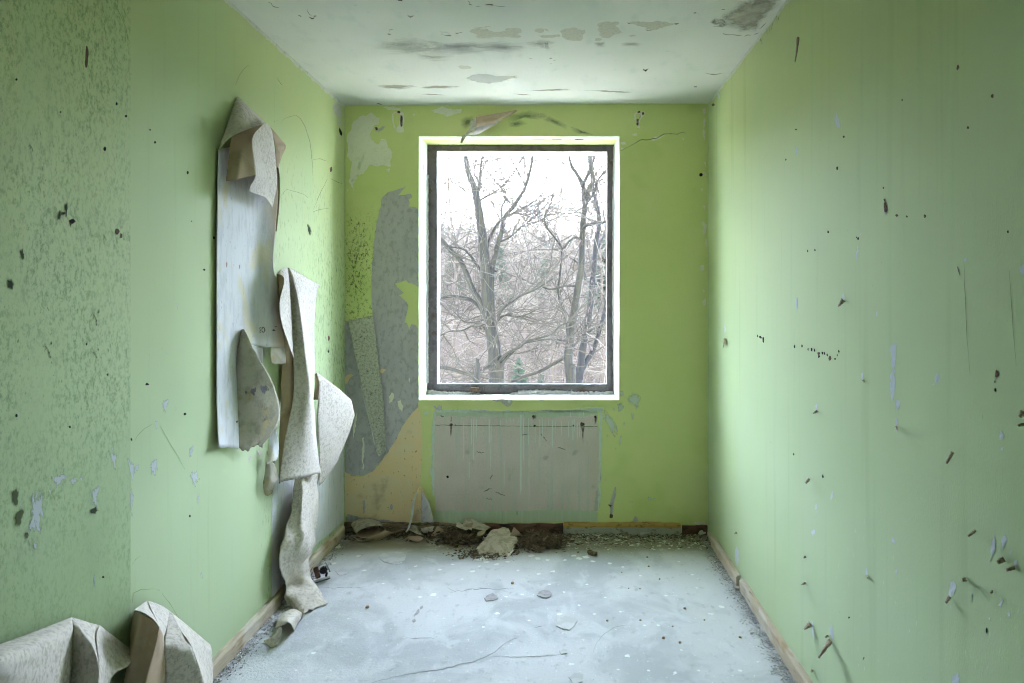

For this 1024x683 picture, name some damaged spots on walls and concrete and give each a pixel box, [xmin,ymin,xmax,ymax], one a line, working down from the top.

spalling [445,21,679,41]
peeling [314,103,645,546]
peeling [19,474,83,548]
peeling [271,477,295,606]